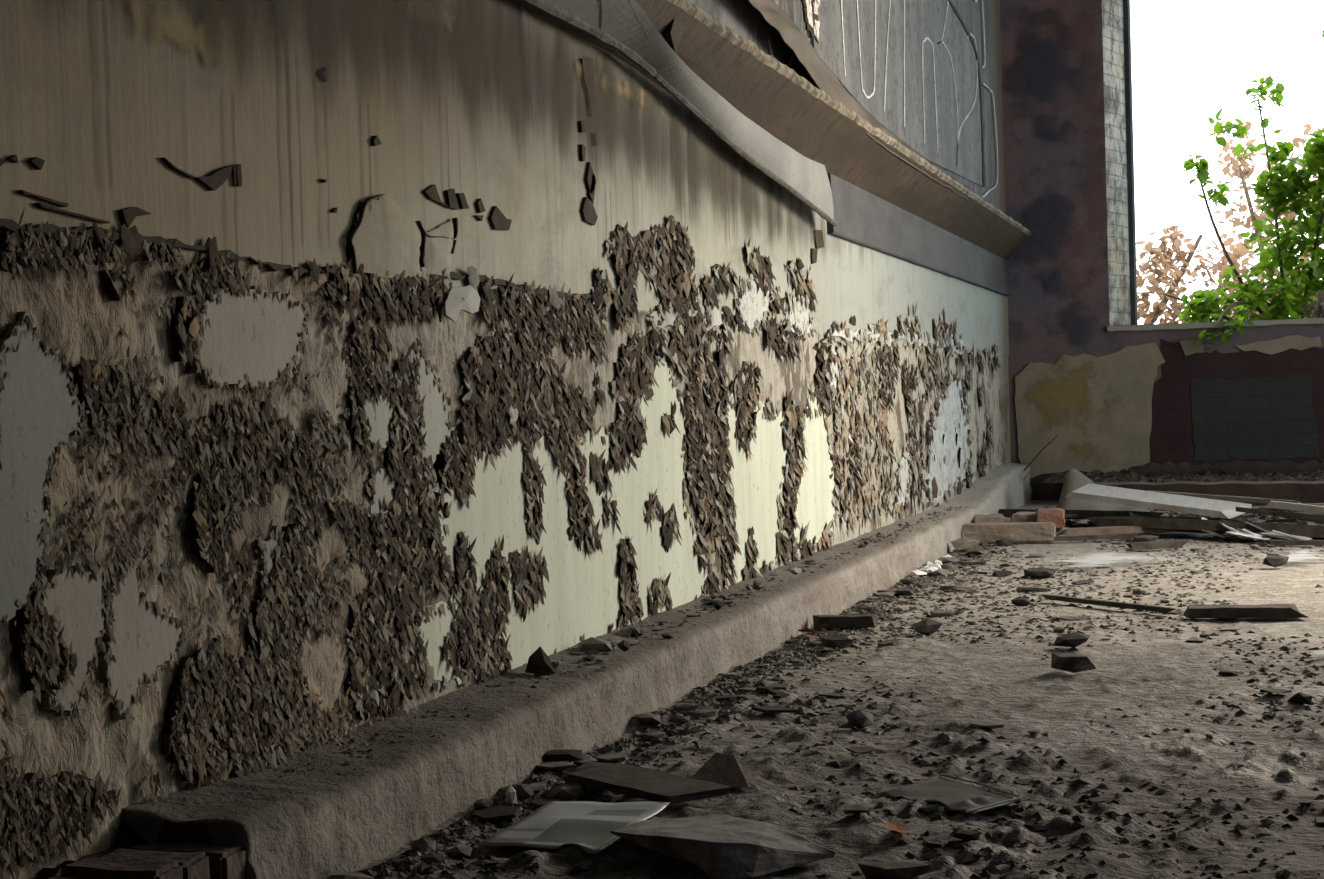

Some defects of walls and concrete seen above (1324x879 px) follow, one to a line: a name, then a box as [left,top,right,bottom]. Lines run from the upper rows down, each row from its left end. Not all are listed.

flaking render [798,0,820,43]
peeling [160,157,242,191]
peeling [421,184,512,230]
peeling [0,207,1324,804]
peeling [0,678,212,879]